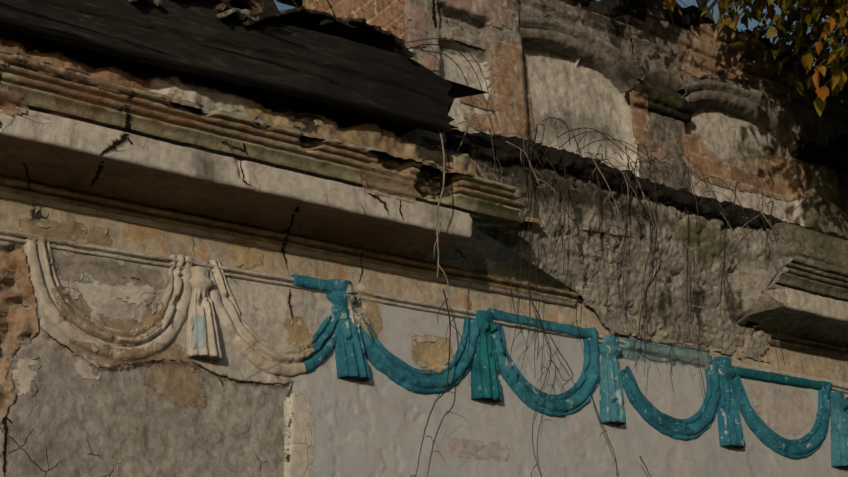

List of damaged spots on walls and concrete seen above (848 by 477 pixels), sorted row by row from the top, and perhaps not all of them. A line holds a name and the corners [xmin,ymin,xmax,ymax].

spalling [0,205,206,423]